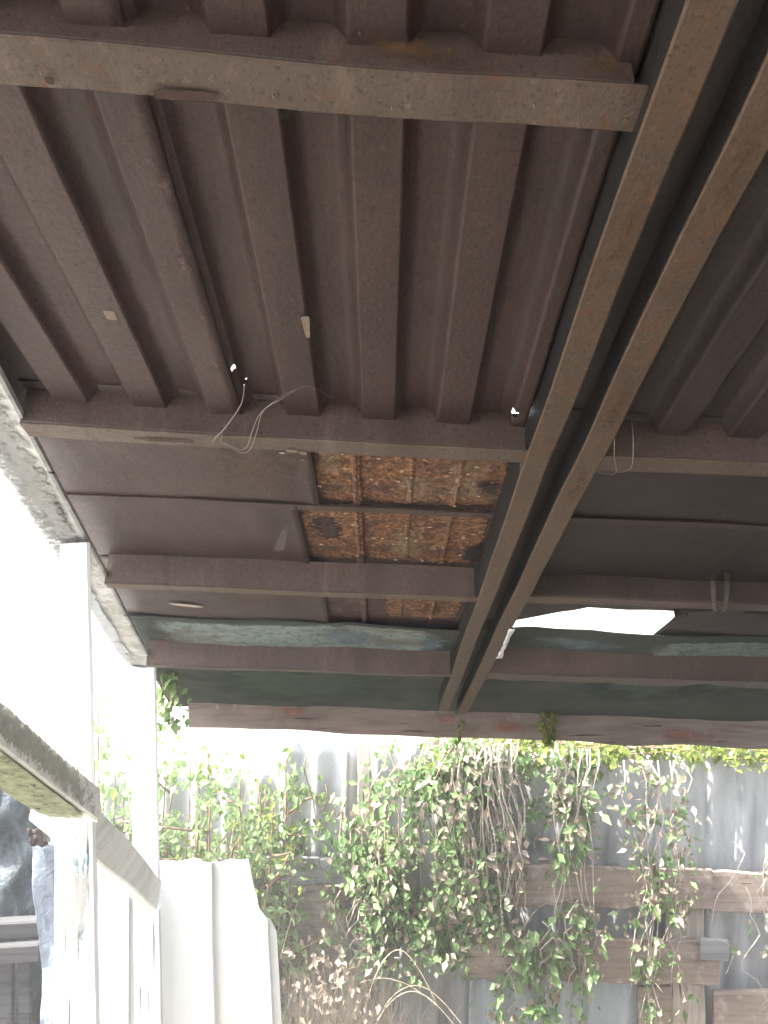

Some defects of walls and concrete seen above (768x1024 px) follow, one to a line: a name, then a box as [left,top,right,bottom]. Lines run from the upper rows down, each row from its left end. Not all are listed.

peeling [0,397,80,565]
corrosion [286,450,510,564]
peeling [91,592,134,668]
corrosion [384,599,462,619]